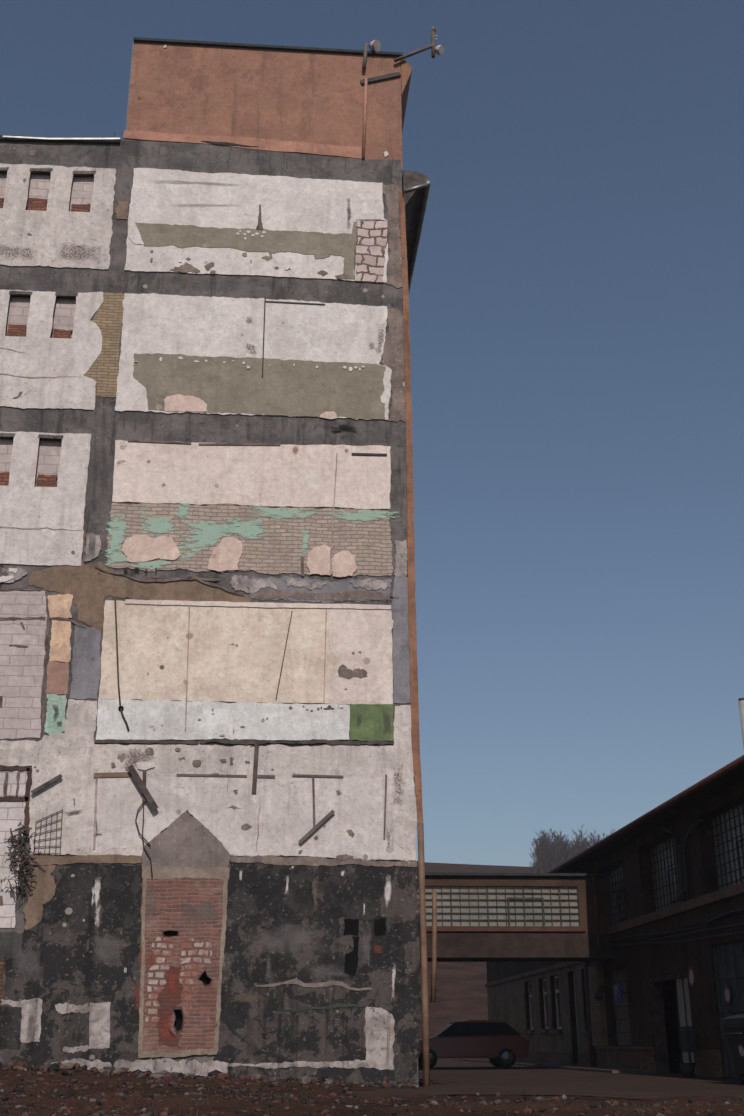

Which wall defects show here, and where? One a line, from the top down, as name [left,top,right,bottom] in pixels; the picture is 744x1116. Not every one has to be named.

peeling [164,394,208,412]
peeling [320,411,337,419]
peeling [381,371,389,420]
peeling [71,503,398,569]
peeling [230,575,400,602]
water stain [92,881,100,923]
spalling [197,969,213,986]
spalling [173,1007,185,1034]